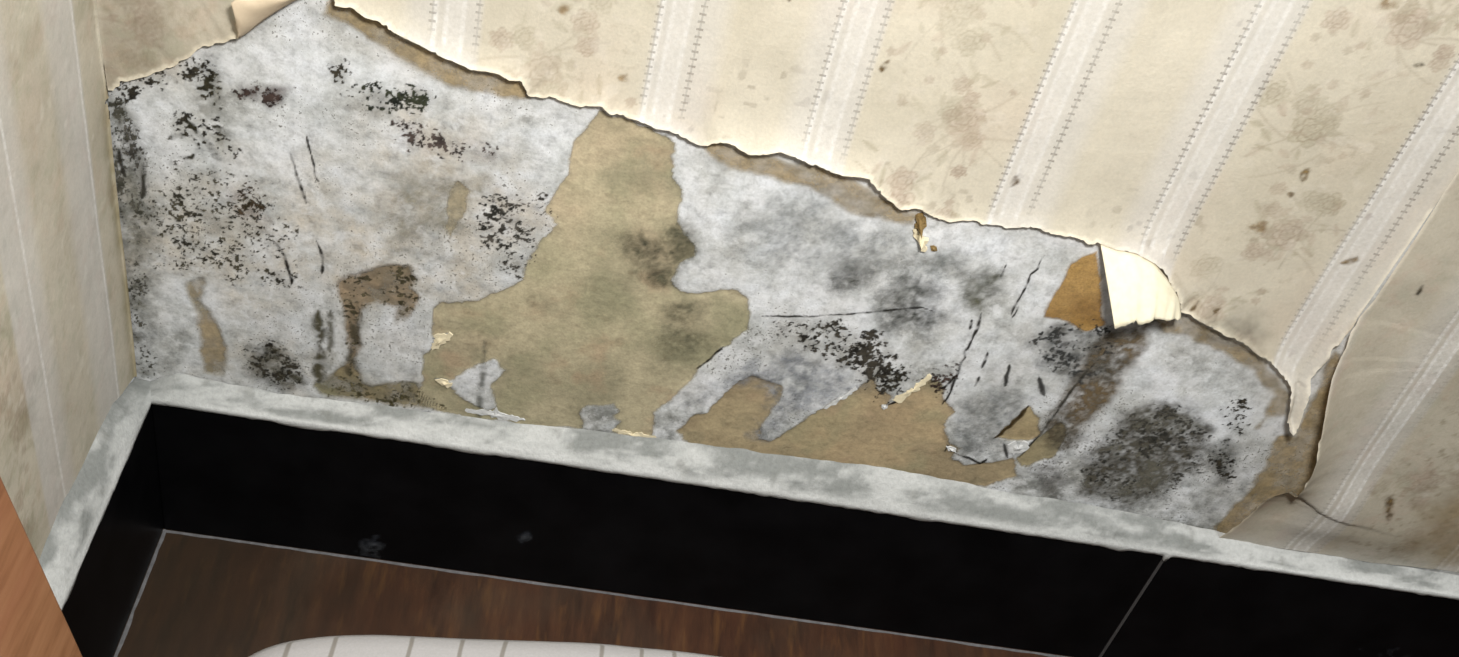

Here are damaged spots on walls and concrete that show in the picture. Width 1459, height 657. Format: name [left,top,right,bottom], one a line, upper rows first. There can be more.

mould [329,59,499,162]
mould [105,57,301,378]
peeling [187,281,226,373]
mould [244,310,359,390]
mould [476,192,552,279]
peeling [314,111,750,438]
mould [742,276,960,411]
peeling [677,373,1066,486]
water stain [968,274,1000,305]
water stain [1029,319,1155,448]
water stain [1081,399,1252,504]